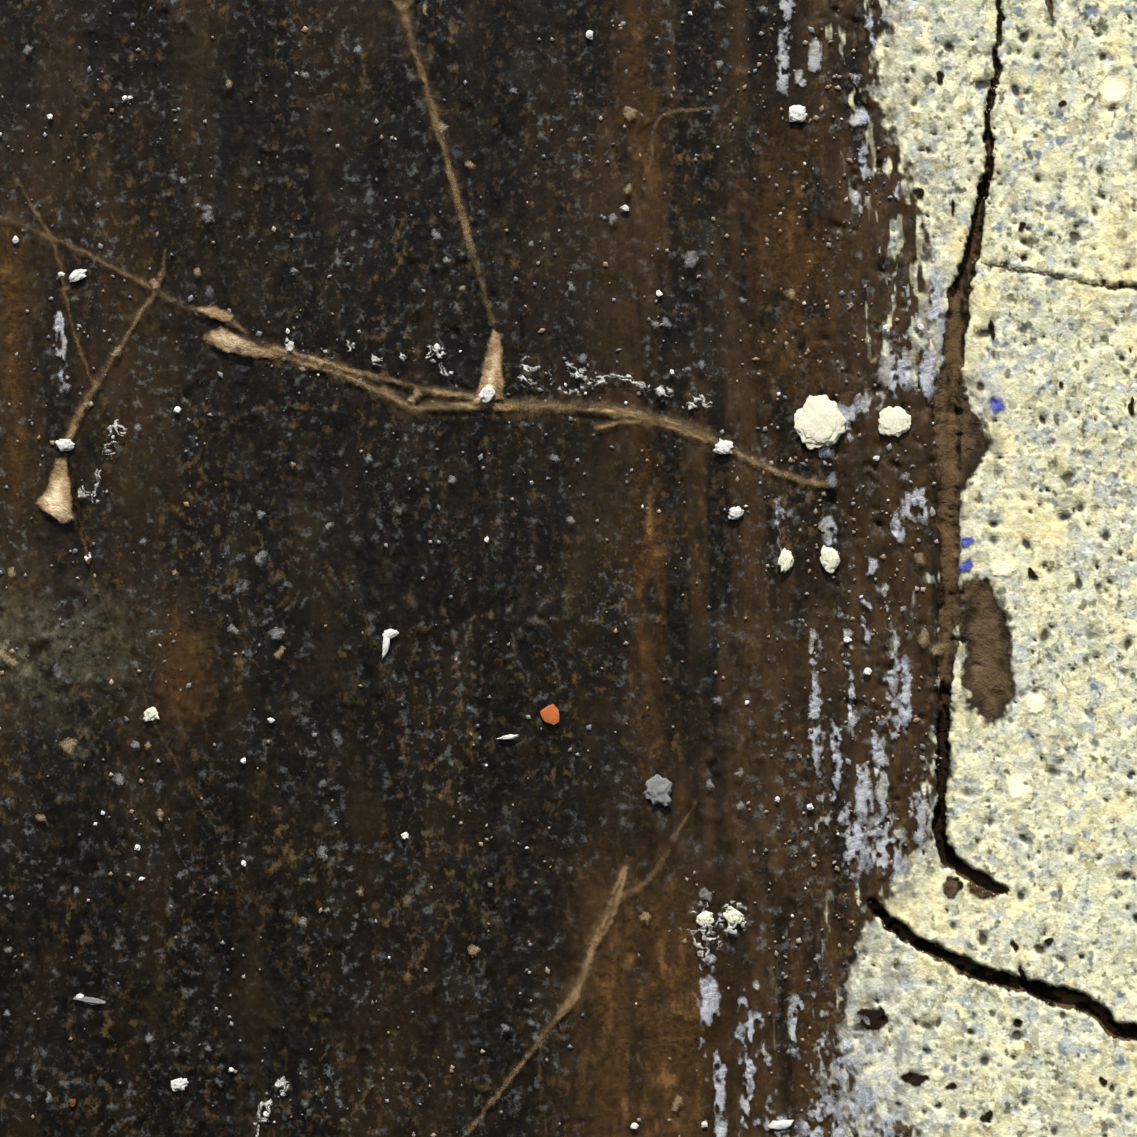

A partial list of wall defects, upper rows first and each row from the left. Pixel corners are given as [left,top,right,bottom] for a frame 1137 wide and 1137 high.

crack [414,52,472,246]
damp [920,222,931,260]
damp [917,264,946,361]
crack [260,347,558,411]
crack [590,408,711,443]
damp [838,404,856,430]
damp [916,347,935,392]
crack [932,0,1137,895]
spalling [959,577,1016,723]
crack [555,867,627,1019]
crack [867,898,1137,1041]
damp [746,1012,754,1041]